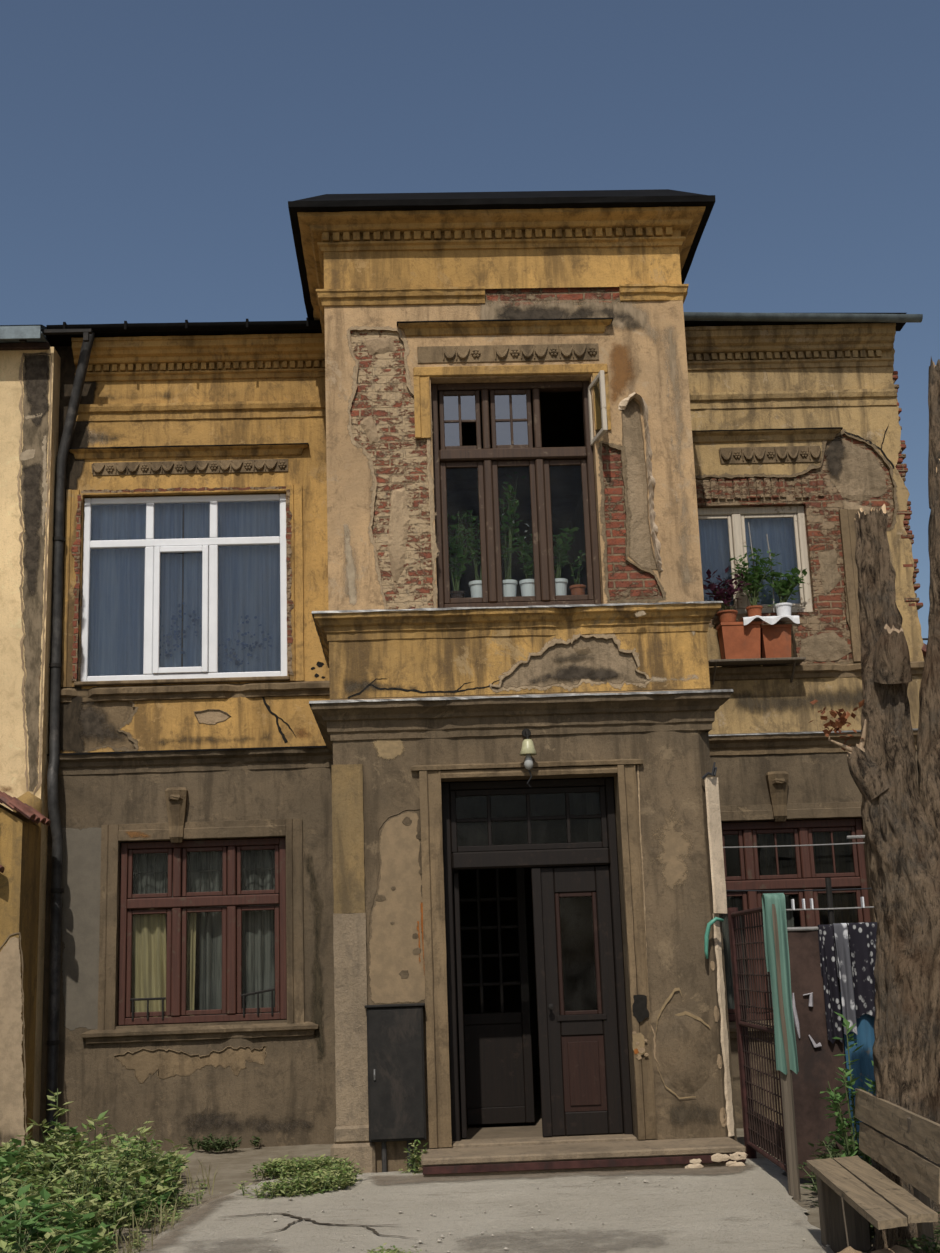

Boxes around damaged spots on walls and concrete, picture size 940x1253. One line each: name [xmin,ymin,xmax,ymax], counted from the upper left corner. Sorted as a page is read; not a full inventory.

spalling [347,326,439,612]
damp [45,337,116,753]
spalling [597,392,666,617]
spalling [695,371,914,665]
spalling [903,559,923,610]
crack [347,678,500,699]
spalling [489,633,653,693]
damp [531,654,619,683]
crack [262,697,296,743]
crack [364,1226,413,1238]